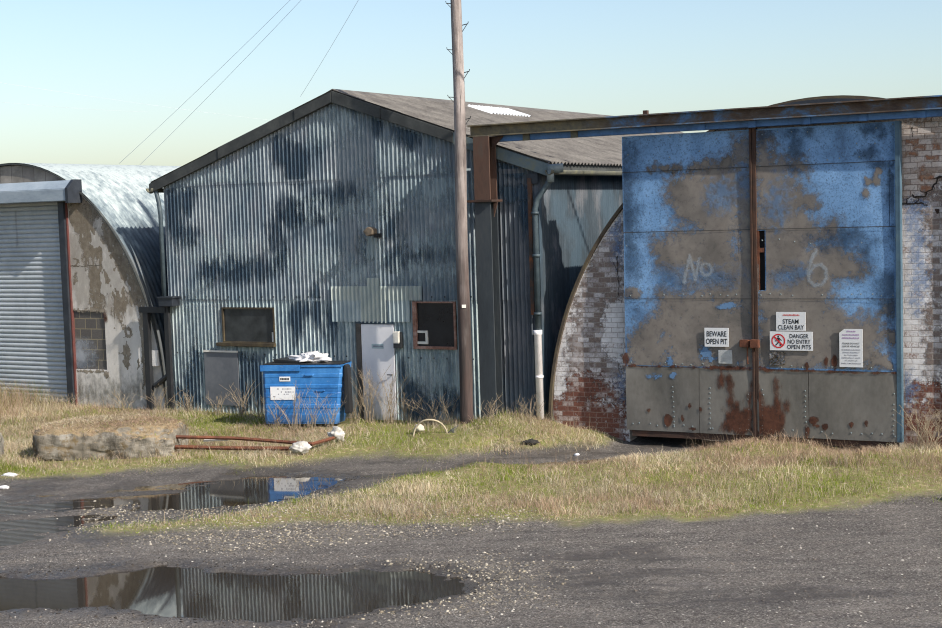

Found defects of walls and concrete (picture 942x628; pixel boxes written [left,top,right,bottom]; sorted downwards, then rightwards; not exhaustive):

water stain [303,106,360,149]
peeling [68,197,146,390]
water stain [180,280,227,371]
water stain [176,164,256,191]
water stain [173,234,265,267]
water stain [287,140,456,286]
peeling [553,130,895,441]
crack [902,176,942,206]
peeling [902,117,942,448]
corrosion [622,352,897,440]